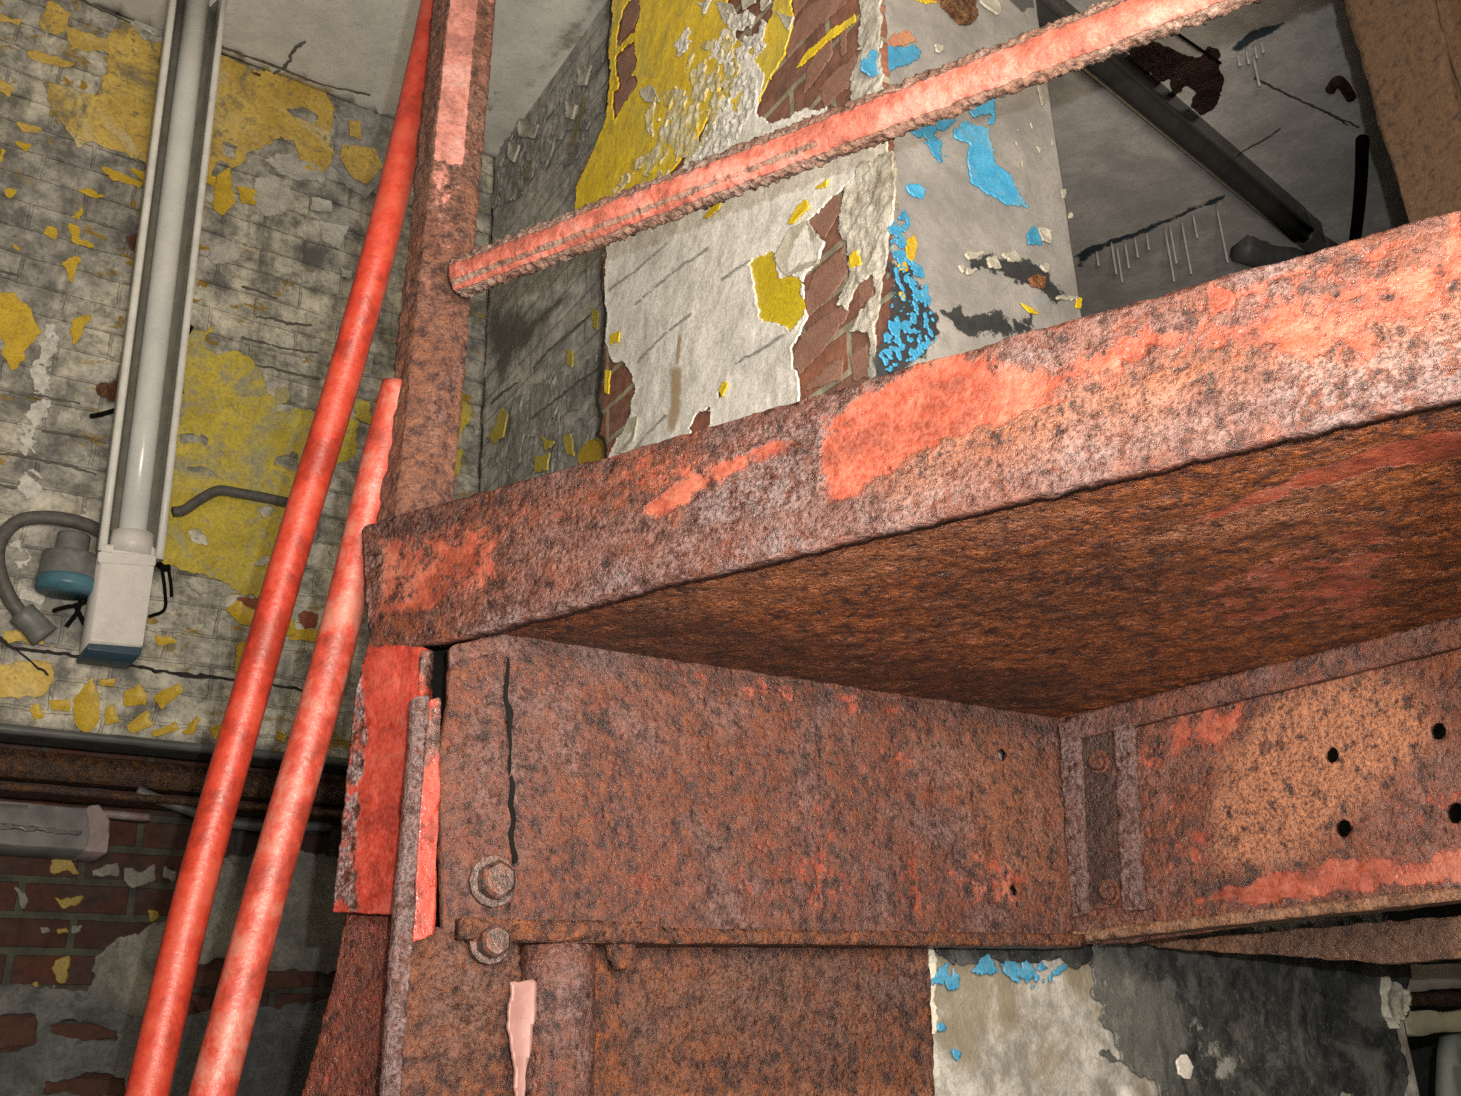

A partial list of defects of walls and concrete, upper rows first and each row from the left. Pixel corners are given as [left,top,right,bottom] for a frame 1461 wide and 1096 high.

peeling [206,55,394,249]
peeling [489,0,944,209]
corrosion [669,337,681,429]
peeling [483,98,1055,492]
corrosion [1027,274,1047,289]
peeling [161,326,319,673]
crack [0,636,79,676]
crack [129,664,235,681]
crack [272,684,302,692]
peeling [0,909,166,1096]
peeling [170,852,255,1096]
peeling [236,850,347,1096]